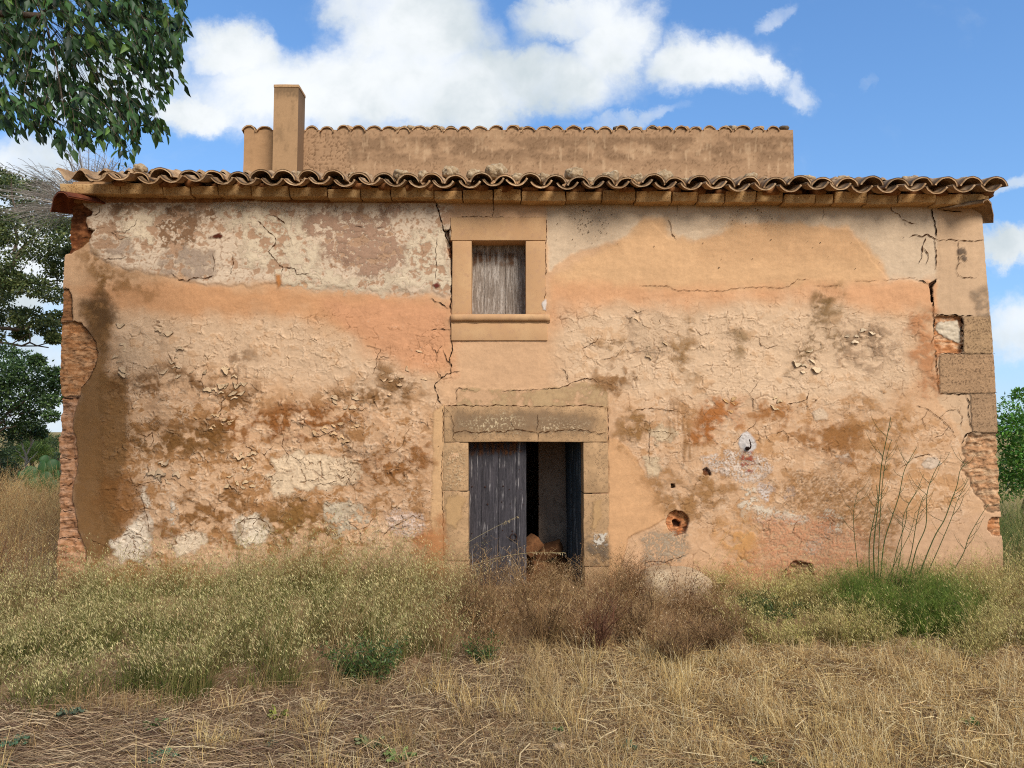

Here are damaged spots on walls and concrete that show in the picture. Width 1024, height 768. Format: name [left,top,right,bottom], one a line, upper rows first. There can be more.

spalling [69,204,94,254]
crack [259,214,307,275]
spalling [57,289,98,579]
damp [99,374,128,540]
peeling [110,459,181,564]
peeling [232,513,274,548]
peeling [266,422,370,539]
crack [309,203,654,556]
spalling [666,510,688,536]
peeling [703,432,843,588]
crack [863,207,998,467]
spalling [961,433,1001,536]